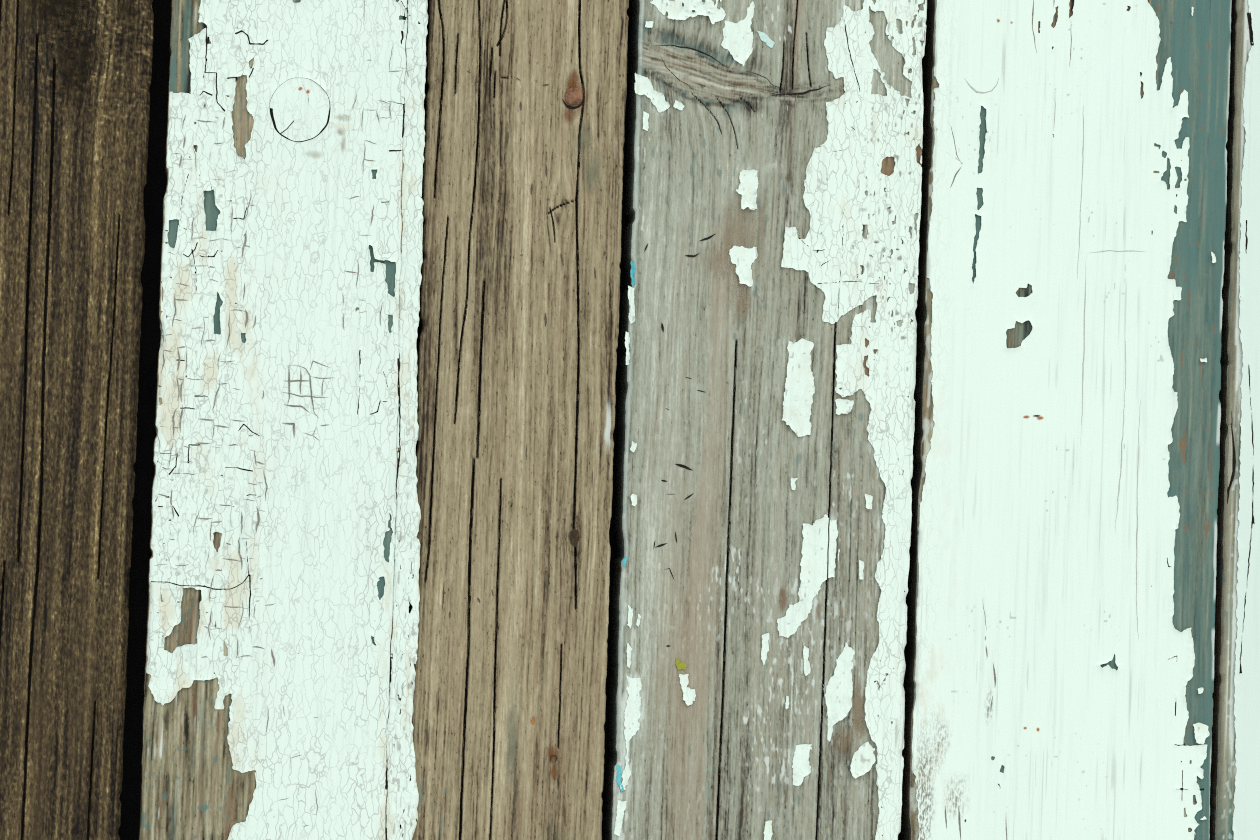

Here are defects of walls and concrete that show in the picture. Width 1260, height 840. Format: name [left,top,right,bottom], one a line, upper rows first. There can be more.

peeling [169,0,207,94]
peeling [645,0,775,66]
peeling [972,106,987,283]
crack [151,1,409,666]
crack [425,0,596,840]
peeling [782,338,815,437]
peeling [1140,0,1253,840]
peeling [164,585,202,653]
peeling [140,673,256,840]
peeling [761,514,840,665]
crack [799,209,879,840]
peeling [824,643,855,741]